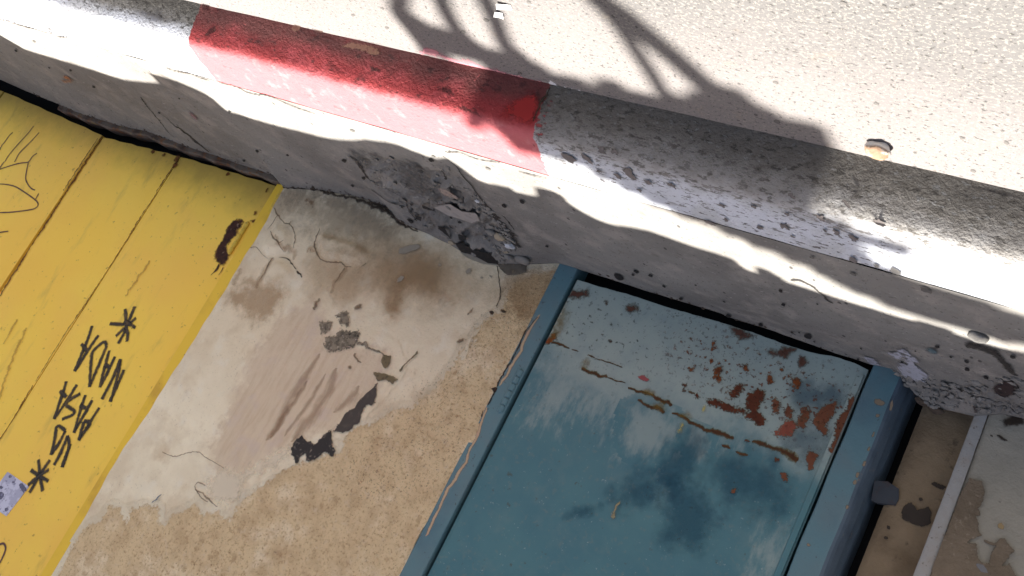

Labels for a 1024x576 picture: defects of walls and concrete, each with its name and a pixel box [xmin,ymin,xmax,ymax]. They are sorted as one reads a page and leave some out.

crack [250,156,418,282]
leakage [198,283,407,503]
peeling [51,178,558,576]
rust [545,320,856,481]
spalling [983,376,1019,397]